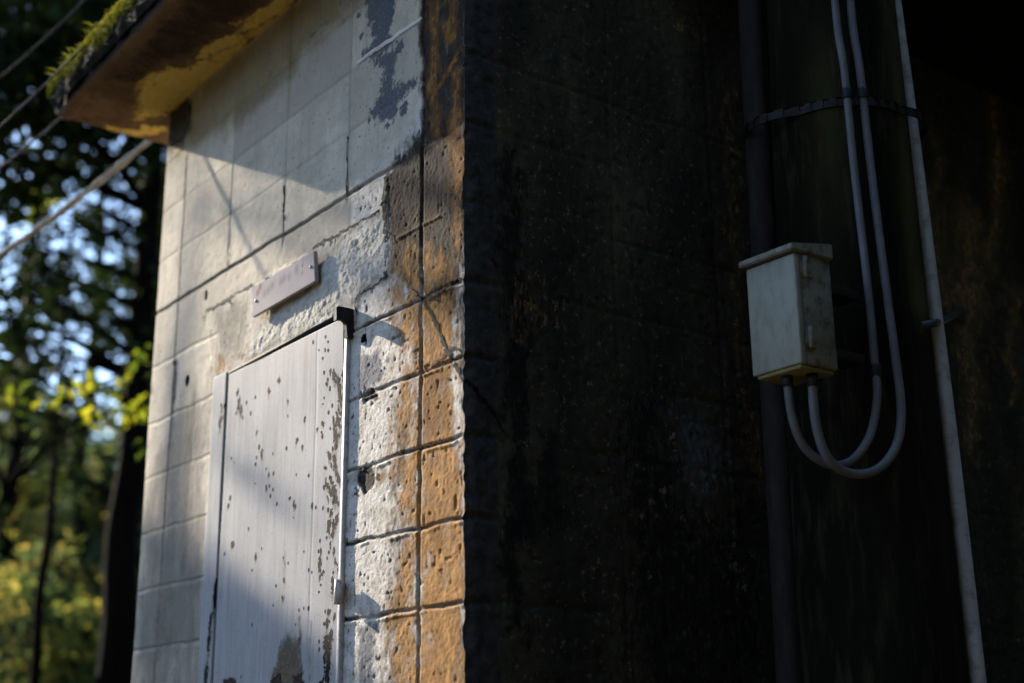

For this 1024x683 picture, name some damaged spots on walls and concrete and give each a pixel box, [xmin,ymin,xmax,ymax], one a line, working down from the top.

damp [118,0,345,152]
peeling [357,0,418,130]